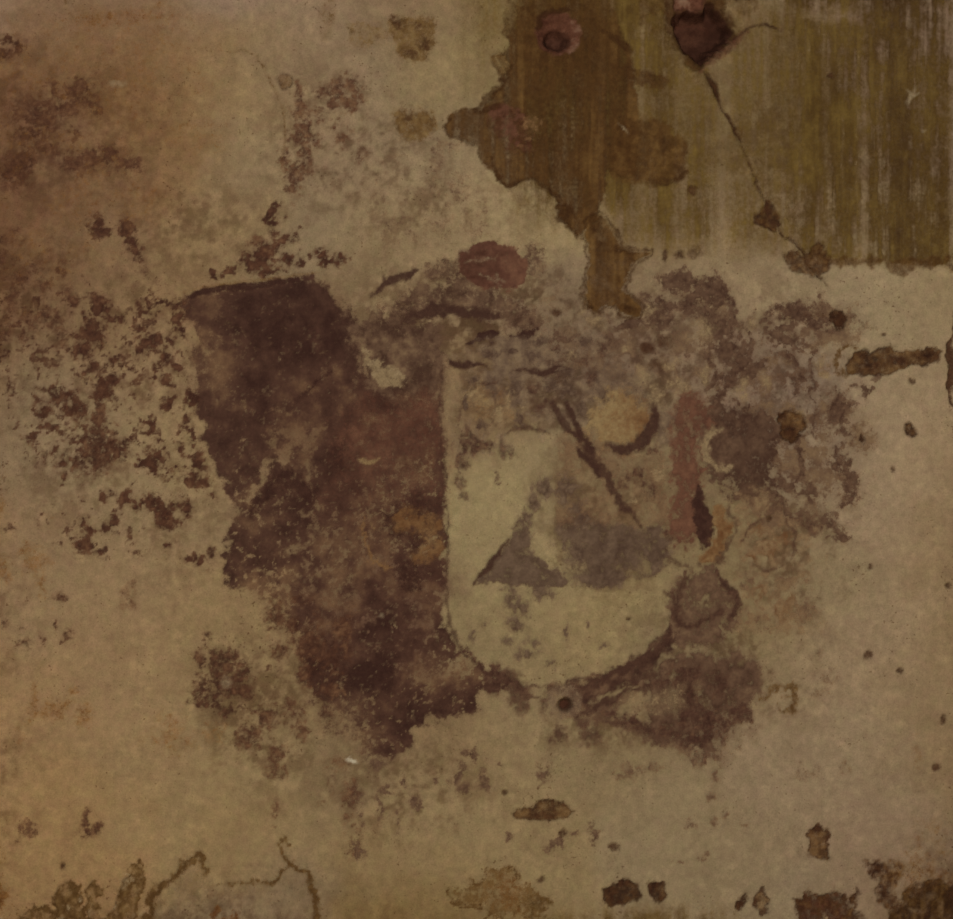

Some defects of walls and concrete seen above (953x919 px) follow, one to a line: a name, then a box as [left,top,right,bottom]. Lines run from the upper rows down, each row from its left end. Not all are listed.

flaking render [665,0,736,71]
damp [1,76,141,191]
flaking render [392,1,694,319]
crack [707,76,740,140]
damp [86,213,145,262]
damp [0,228,214,555]
flaking render [834,344,941,376]
crack [945,334,953,405]
damp [185,547,215,566]
damp [187,633,309,779]
flaking render [603,879,666,907]
flaking render [867,860,953,919]